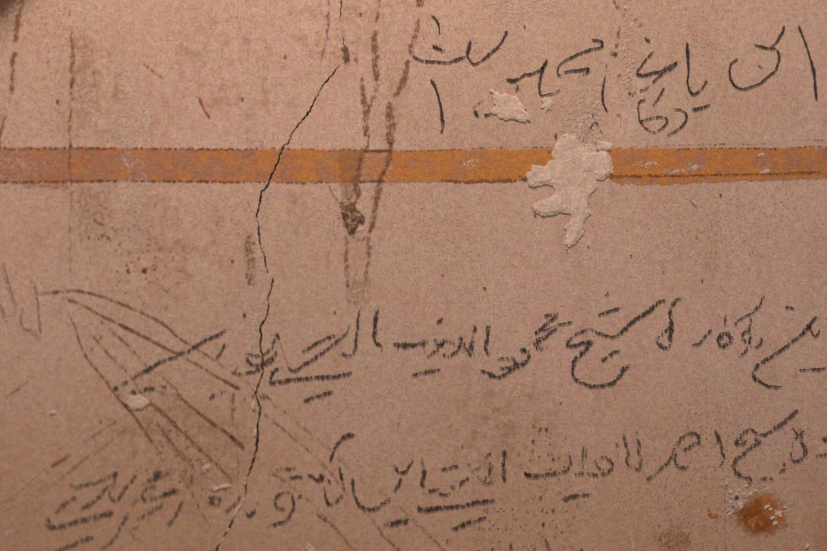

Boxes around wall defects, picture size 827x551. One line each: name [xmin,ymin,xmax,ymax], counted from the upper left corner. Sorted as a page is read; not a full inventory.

leakage [340,19,420,286]
flaking render [489,89,531,122]
flaking render [519,88,613,251]
crack [215,0,357,551]
rust [708,474,796,537]